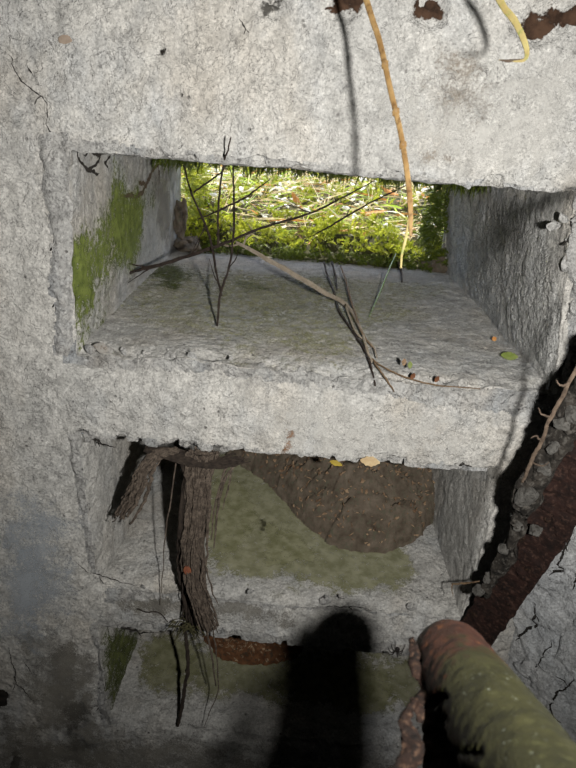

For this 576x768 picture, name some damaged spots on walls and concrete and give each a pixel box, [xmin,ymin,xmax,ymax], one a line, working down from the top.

crack [8,54,51,132]
leakage [72,222,96,316]
crack [515,608,539,641]
crack [535,641,575,723]